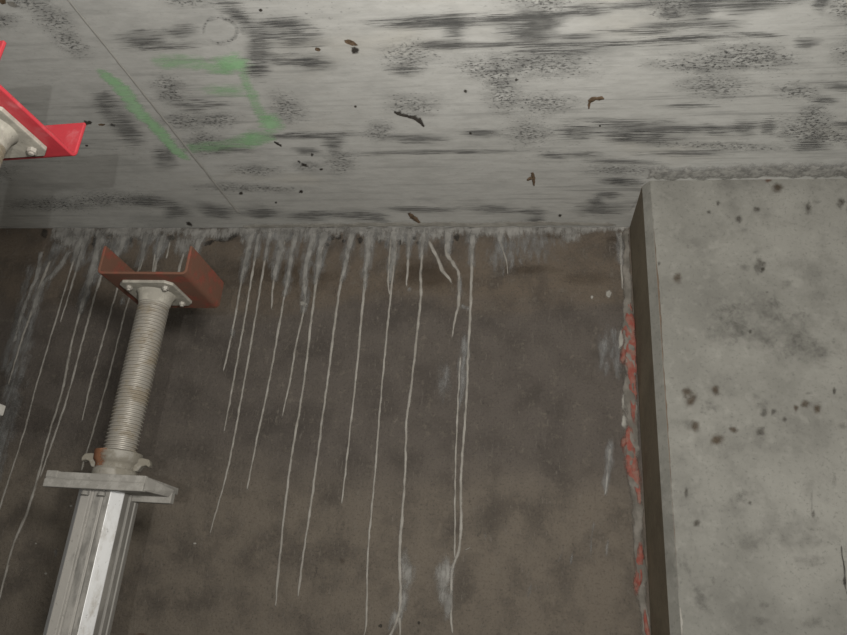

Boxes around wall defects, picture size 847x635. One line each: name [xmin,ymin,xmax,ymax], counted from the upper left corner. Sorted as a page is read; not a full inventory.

leakage [216,2,325,76]
leakage [275,133,359,173]
leakage [370,0,847,214]
leakage [0,206,628,635]